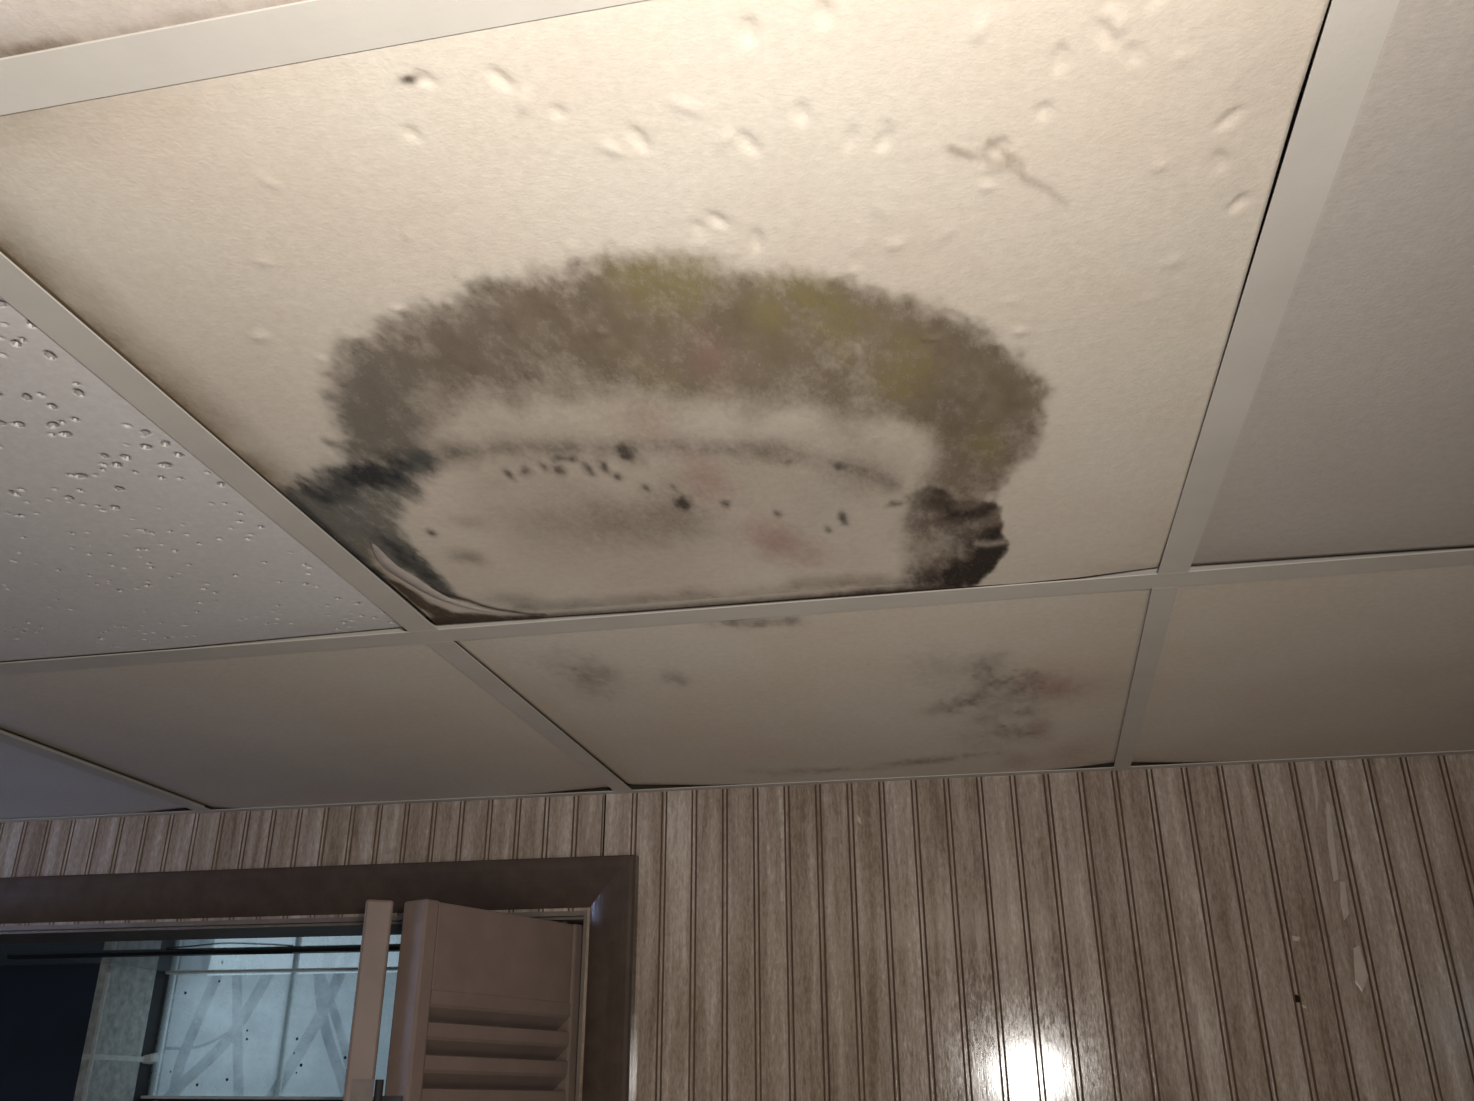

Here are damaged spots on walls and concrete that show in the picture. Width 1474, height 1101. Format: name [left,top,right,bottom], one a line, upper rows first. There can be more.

leakage [0,242,55,294]
leakage [77,314,218,435]
leakage [239,259,1045,625]